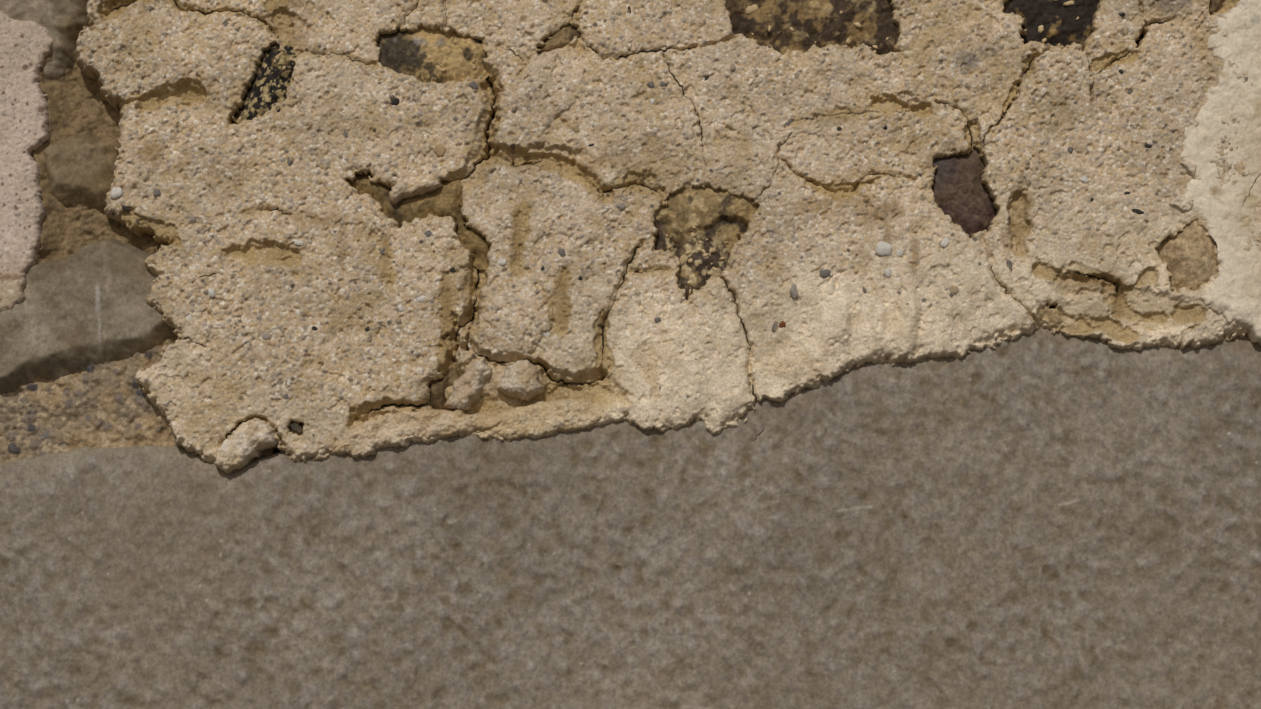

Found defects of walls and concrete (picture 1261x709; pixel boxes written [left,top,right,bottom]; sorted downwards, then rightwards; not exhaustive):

hole [232,37,299,124]
spalling [377,27,490,83]
crack [464,78,663,197]
crack [571,0,707,174]
spalling [654,186,759,300]
spalling [725,0,899,55]
crack [756,50,1047,200]
spalling [931,148,997,238]
spalling [1003,0,1099,51]
crack [453,243,663,385]
crack [722,278,757,400]
crack [364,403,428,414]